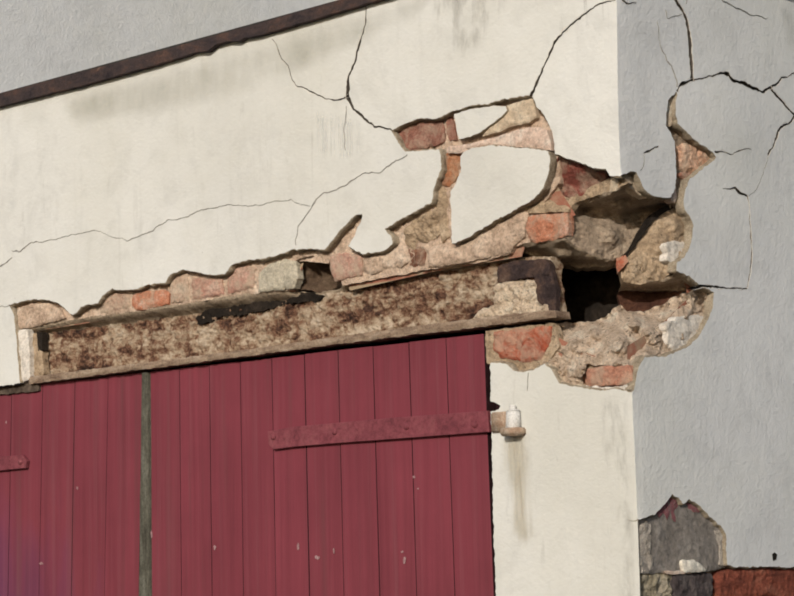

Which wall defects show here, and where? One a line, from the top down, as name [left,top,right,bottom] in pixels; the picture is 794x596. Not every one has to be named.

crack [0,155,407,267]
crack [272,7,392,150]
spalling [16,97,710,390]
crack [529,0,635,97]
crack [657,0,794,290]
spalling [638,498,794,596]